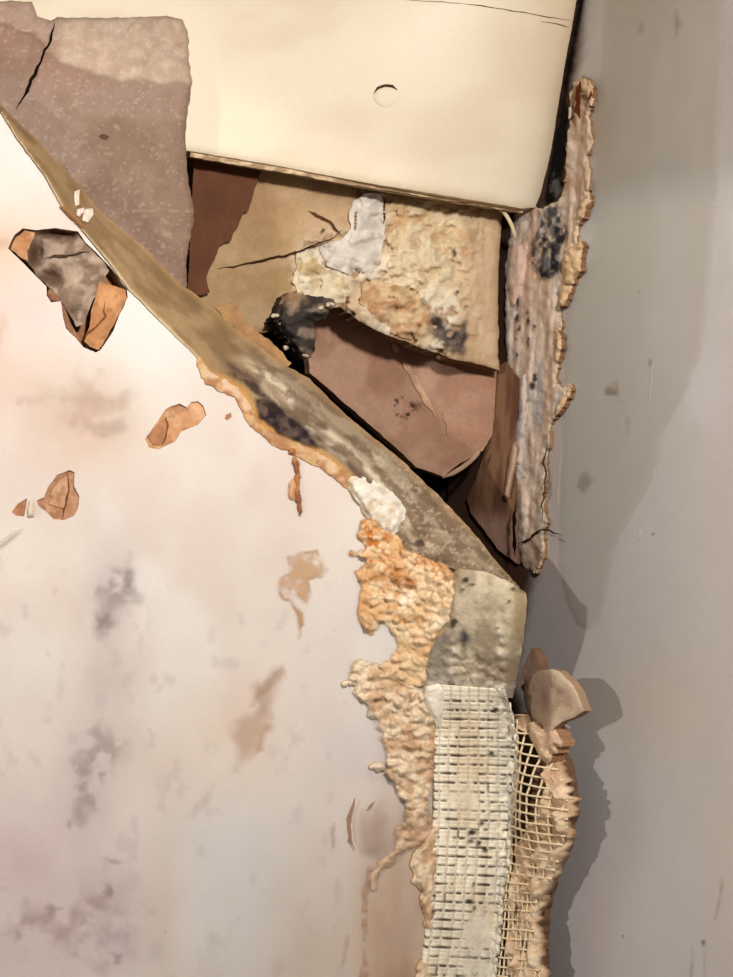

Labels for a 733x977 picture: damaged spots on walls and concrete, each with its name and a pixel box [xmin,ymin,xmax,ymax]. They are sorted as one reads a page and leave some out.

crack [412,0,569,27]
crack [16,23,55,109]
leakage [531,0,584,277]
crack [217,211,342,269]
flaking render [198,171,503,372]
crack [380,195,388,224]
peeling [556,241,589,308]
peeling [576,194,595,224]
peeling [145,401,205,449]
leakage [234,374,318,447]
peeling [552,385,576,419]
flaking render [523,669,592,733]